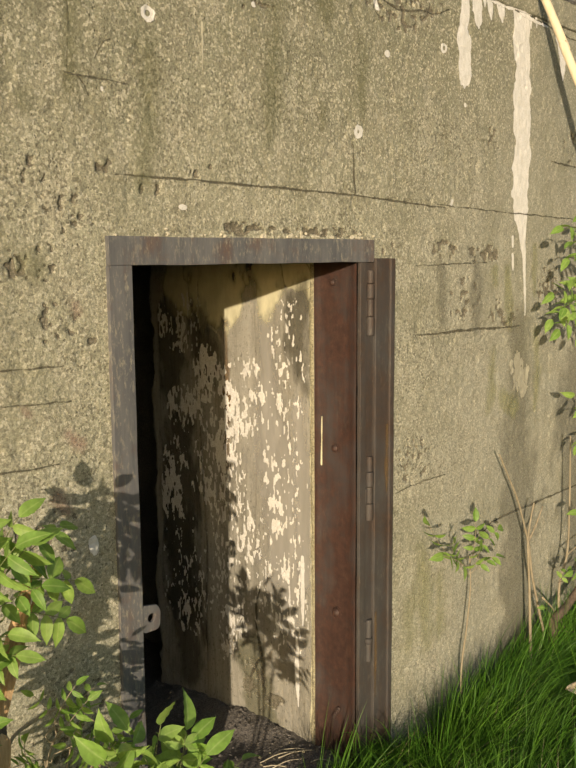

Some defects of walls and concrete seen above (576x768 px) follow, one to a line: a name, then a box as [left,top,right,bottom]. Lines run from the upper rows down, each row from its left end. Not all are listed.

spalling [366,0,443,33]
crack [66,38,128,96]
leakage [555,36,566,81]
leakage [457,0,548,315]
crack [115,143,573,220]
crack [417,325,519,335]
crack [0,365,63,373]
crack [2,400,72,408]
crack [0,464,59,475]
peeling [157,292,309,660]